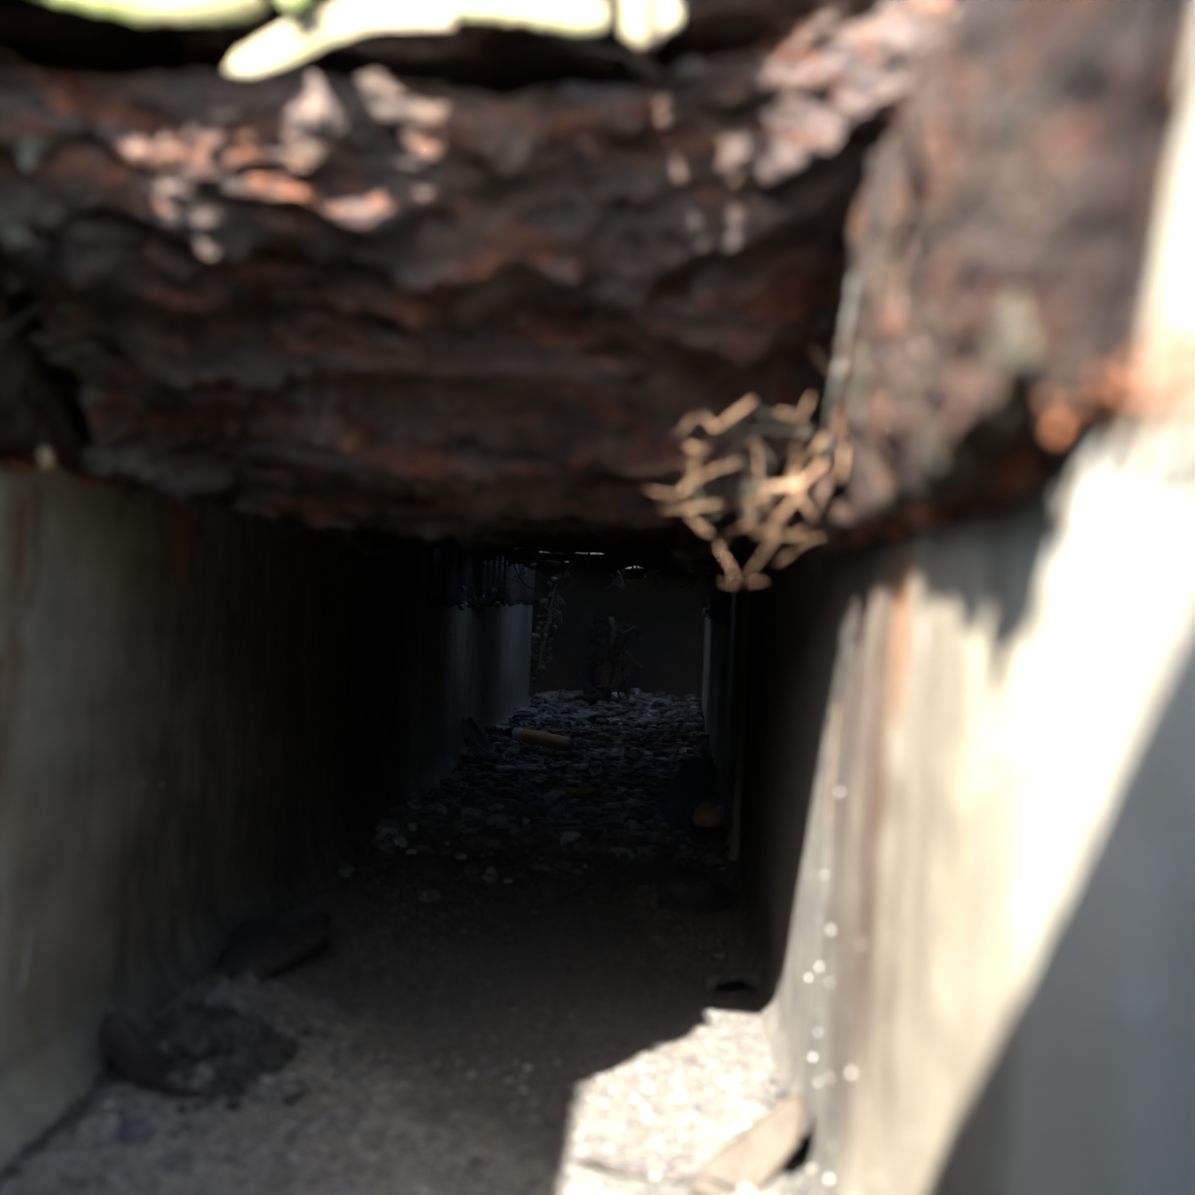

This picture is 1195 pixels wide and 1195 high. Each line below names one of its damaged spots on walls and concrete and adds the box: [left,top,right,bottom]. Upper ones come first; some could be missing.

rust [845,92,906,171]
rust [187,151,529,238]
rust [0,204,338,316]
rust [505,226,663,289]
rust [293,334,662,384]
rust [625,301,816,370]
rust [917,273,1036,477]
rust [130,444,559,531]